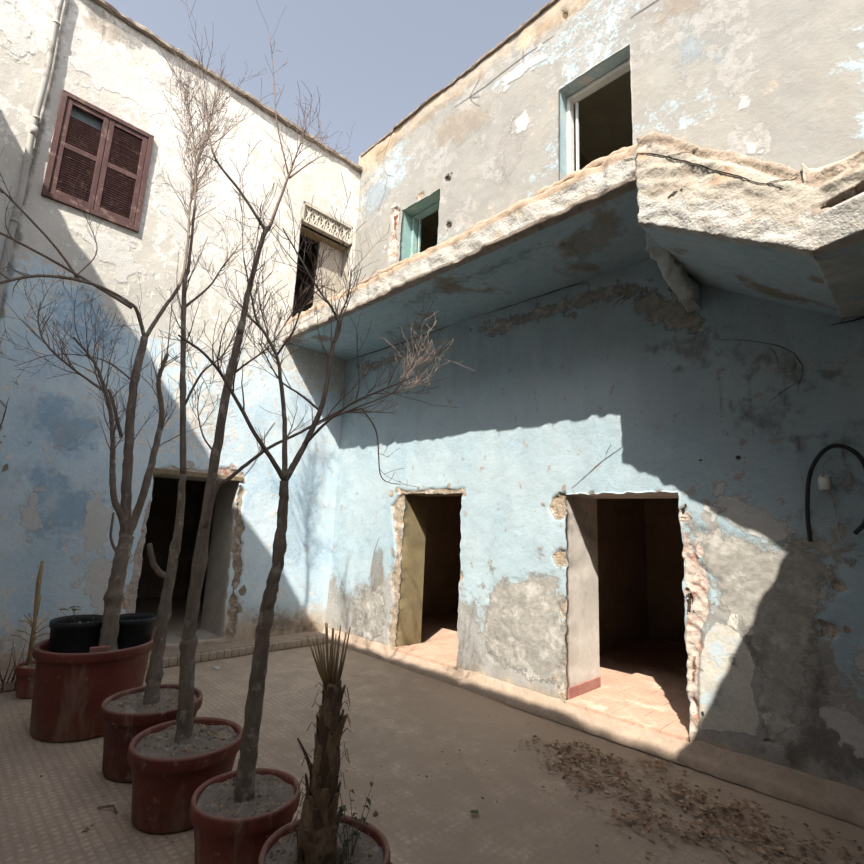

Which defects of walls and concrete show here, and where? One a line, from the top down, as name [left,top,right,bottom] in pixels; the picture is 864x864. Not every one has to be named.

crack [624,148,797,187]
flaking render [466,280,648,337]
flaking render [153,461,246,639]
peeling [351,483,466,650]
peeling [478,546,568,699]
peeling [679,482,864,759]